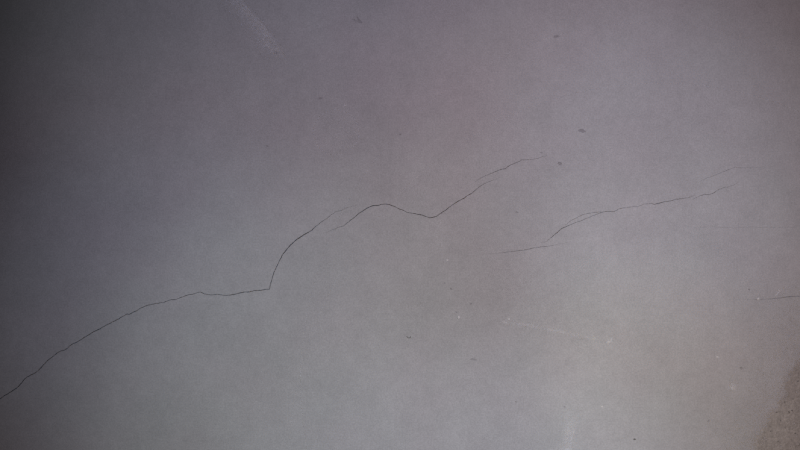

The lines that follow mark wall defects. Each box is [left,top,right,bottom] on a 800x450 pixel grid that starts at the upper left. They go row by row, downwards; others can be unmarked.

crack [0,156,544,399]